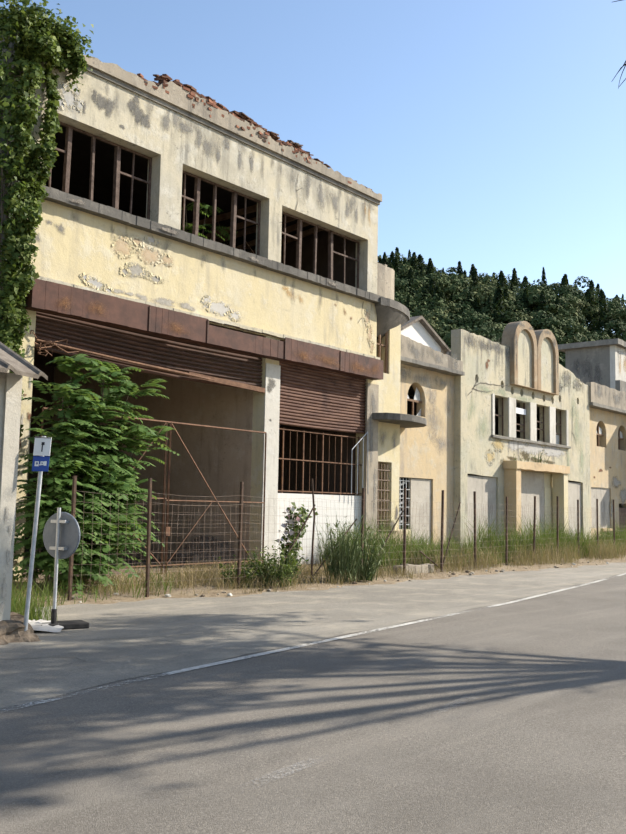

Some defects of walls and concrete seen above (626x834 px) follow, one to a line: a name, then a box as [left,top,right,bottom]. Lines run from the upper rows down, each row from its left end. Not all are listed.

damp [83,90,115,116]
damp [128,95,150,128]
flaking render [137,73,317,165]
peeling [112,234,174,267]
peeling [79,272,114,293]
peeling [202,295,241,322]
damp [508,440,569,465]